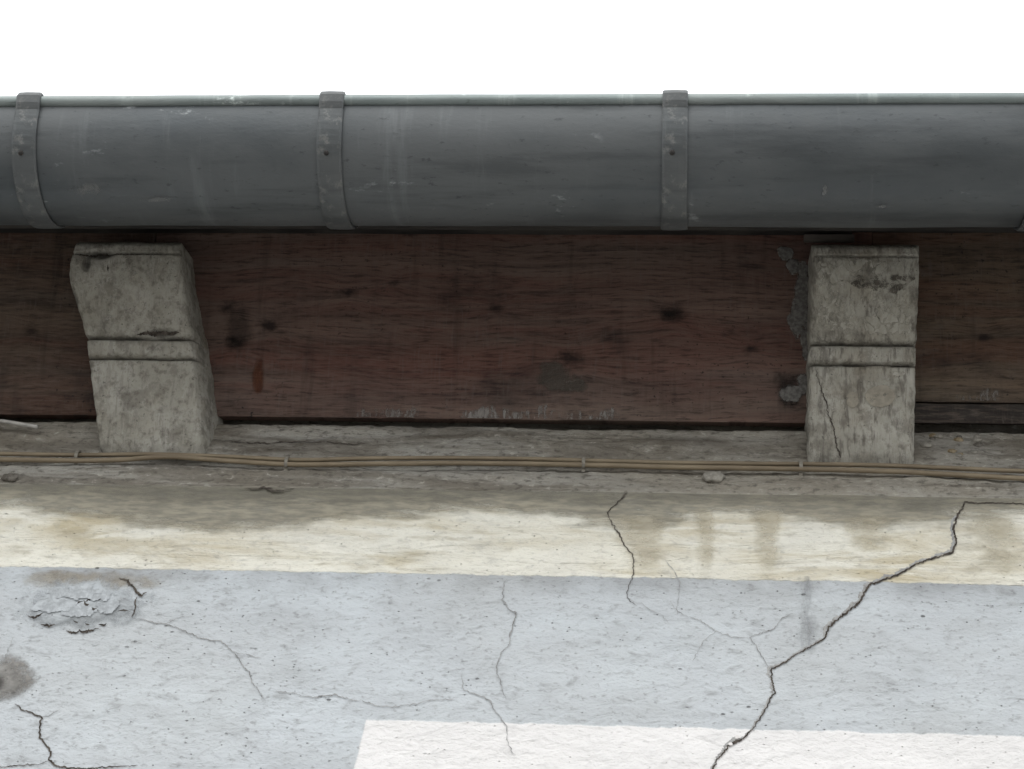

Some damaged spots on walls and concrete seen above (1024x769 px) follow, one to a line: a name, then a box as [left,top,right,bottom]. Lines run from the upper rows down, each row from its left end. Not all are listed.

crack [816,370,841,458]
damp [0,484,1024,538]
crack [132,581,517,754]
crack [607,493,1024,769]
crack [1,705,136,769]